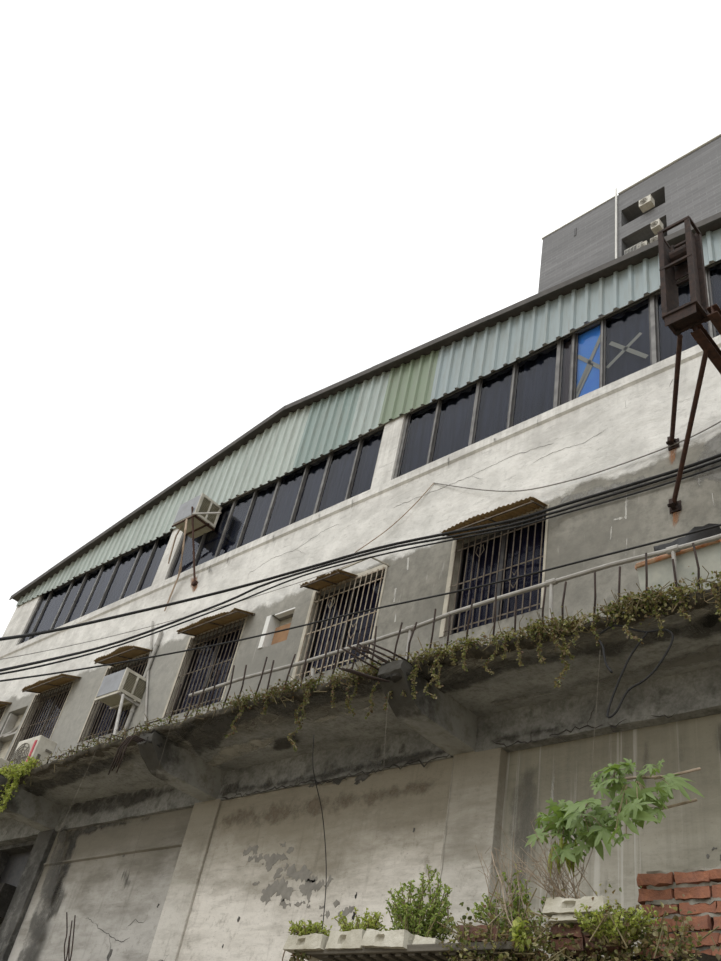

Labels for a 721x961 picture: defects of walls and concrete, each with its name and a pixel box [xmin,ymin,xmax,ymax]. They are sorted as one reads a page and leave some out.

crack [493,709,626,748]
water stain [517,774,534,890]
peeling [243,842,357,924]